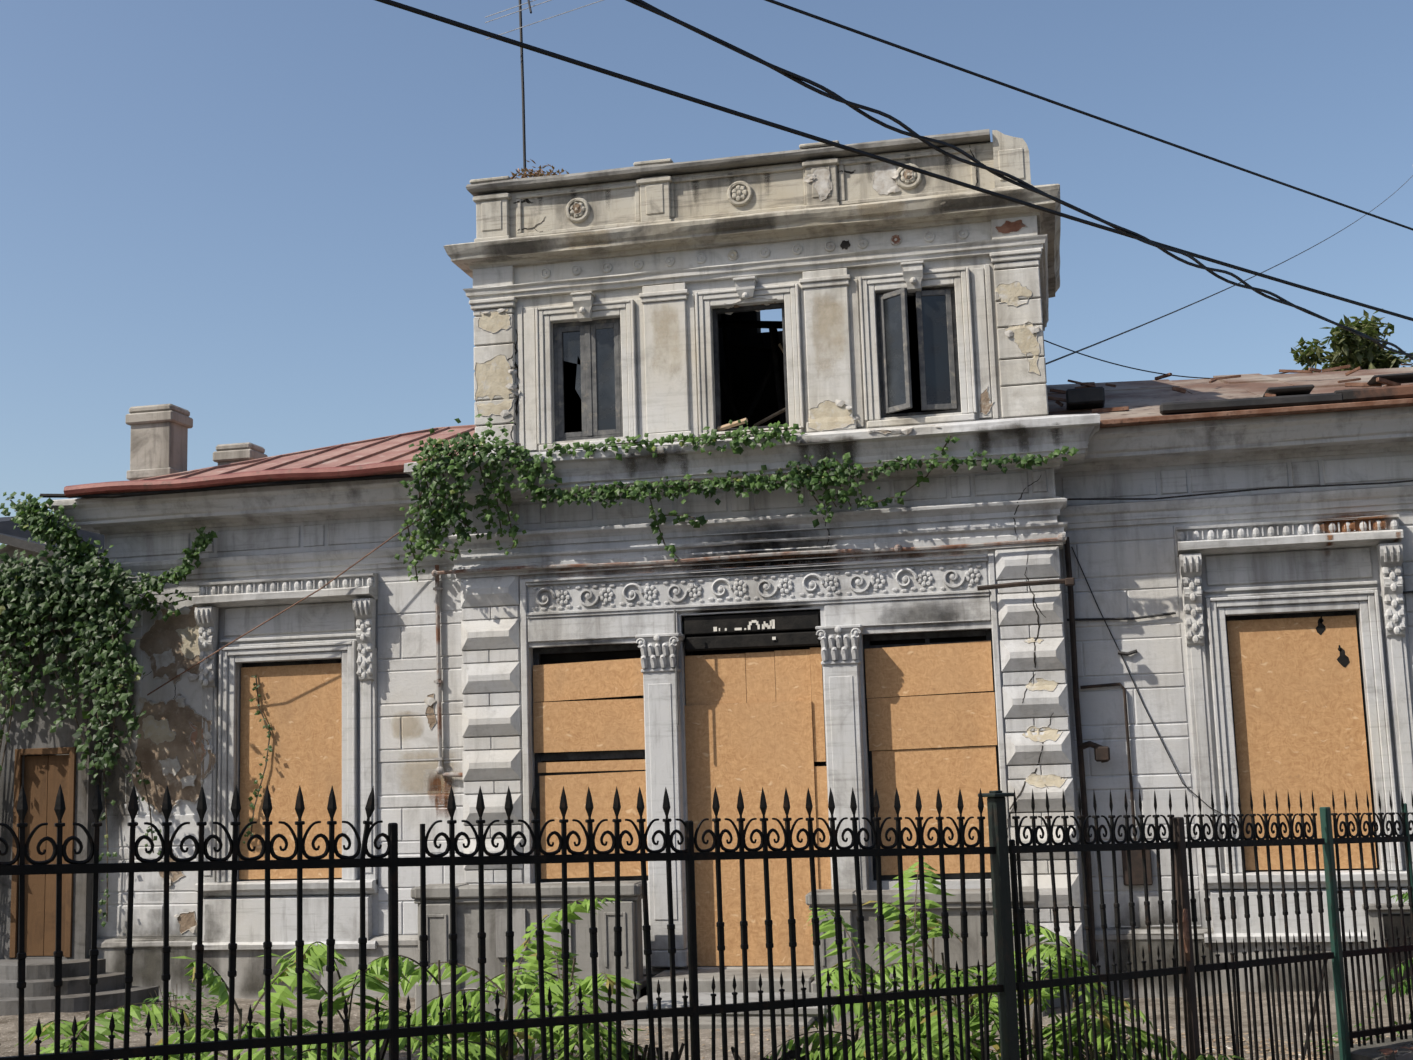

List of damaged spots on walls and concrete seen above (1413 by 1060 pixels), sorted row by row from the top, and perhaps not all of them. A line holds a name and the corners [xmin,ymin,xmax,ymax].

peeling [478,308,511,333]
peeling [1004,321,1040,375]
peeling [475,354,520,417]
crack [1007,476,1053,829]
peeling [131,604,218,817]
peeling [1025,678,1060,692]
peeling [1022,725,1063,742]
spalling [1375,1041,1413,1060]